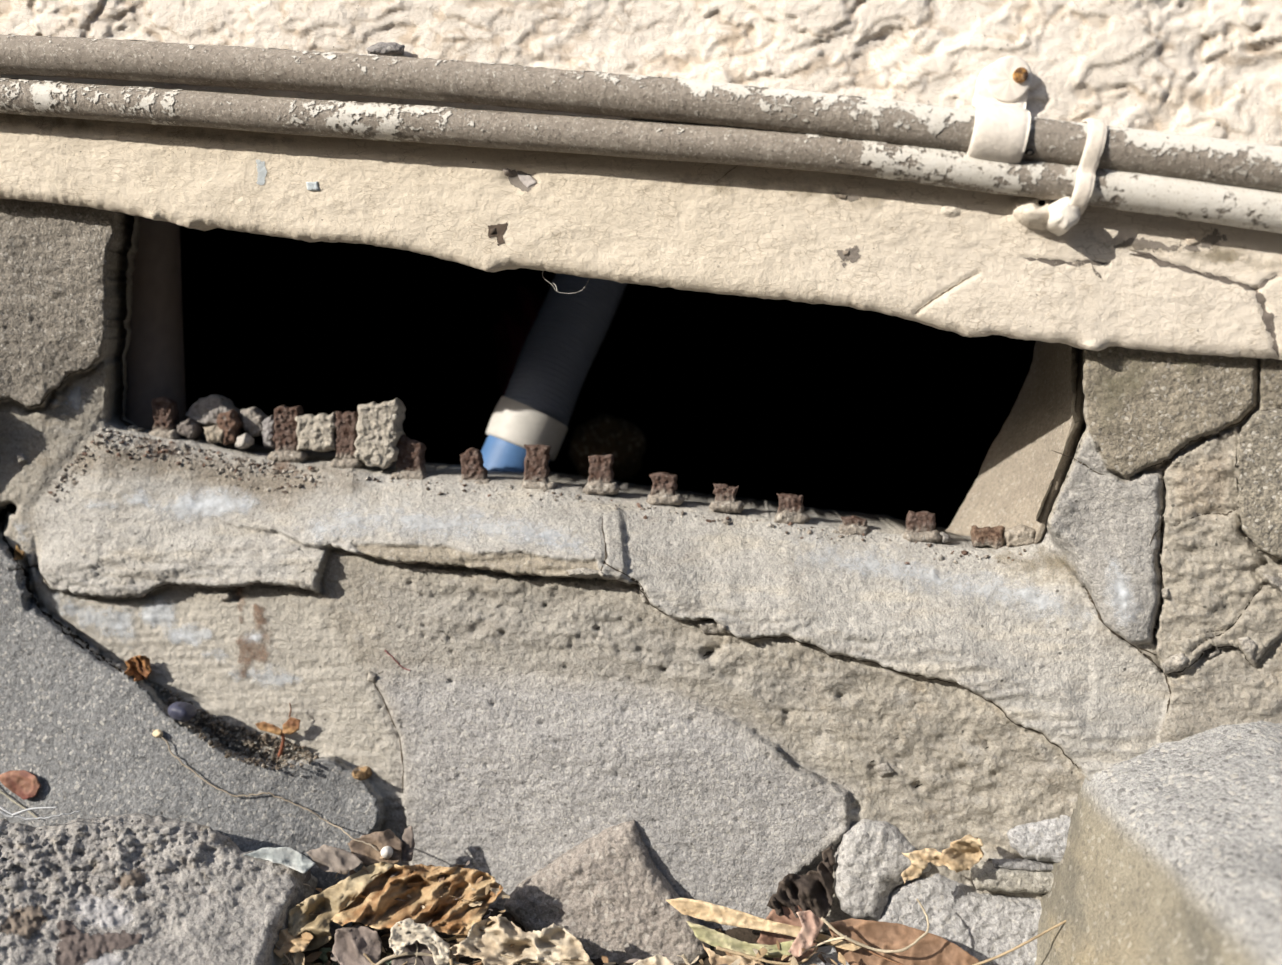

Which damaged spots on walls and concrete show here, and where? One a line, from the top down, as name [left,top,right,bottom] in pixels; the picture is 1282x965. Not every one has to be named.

peeling [225,45,413,75]
peeling [0,77,184,126]
peeling [274,99,499,144]
peeling [428,58,1078,199]
peeling [1029,117,1088,139]
peeling [306,181,320,191]
peeling [834,193,861,202]
peeling [1089,126,1282,252]
peeling [488,222,507,246]
crack [1025,249,1279,357]
crack [601,517,648,597]